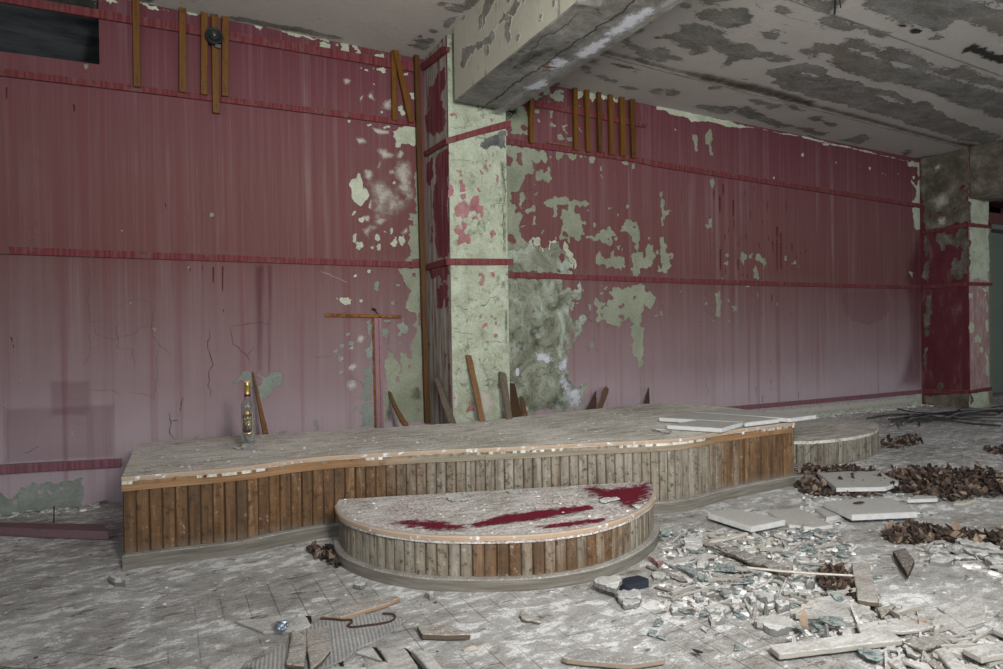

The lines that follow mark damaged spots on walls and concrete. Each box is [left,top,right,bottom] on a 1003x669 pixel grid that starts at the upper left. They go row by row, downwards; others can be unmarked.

peeling [46,0,119,9]
peeling [140,0,170,13]
peeling [229,16,387,74]
peeling [366,67,457,149]
peeling [479,83,674,368]
peeling [578,0,1003,377]
peeling [322,155,707,454]
crack [207,322,265,395]